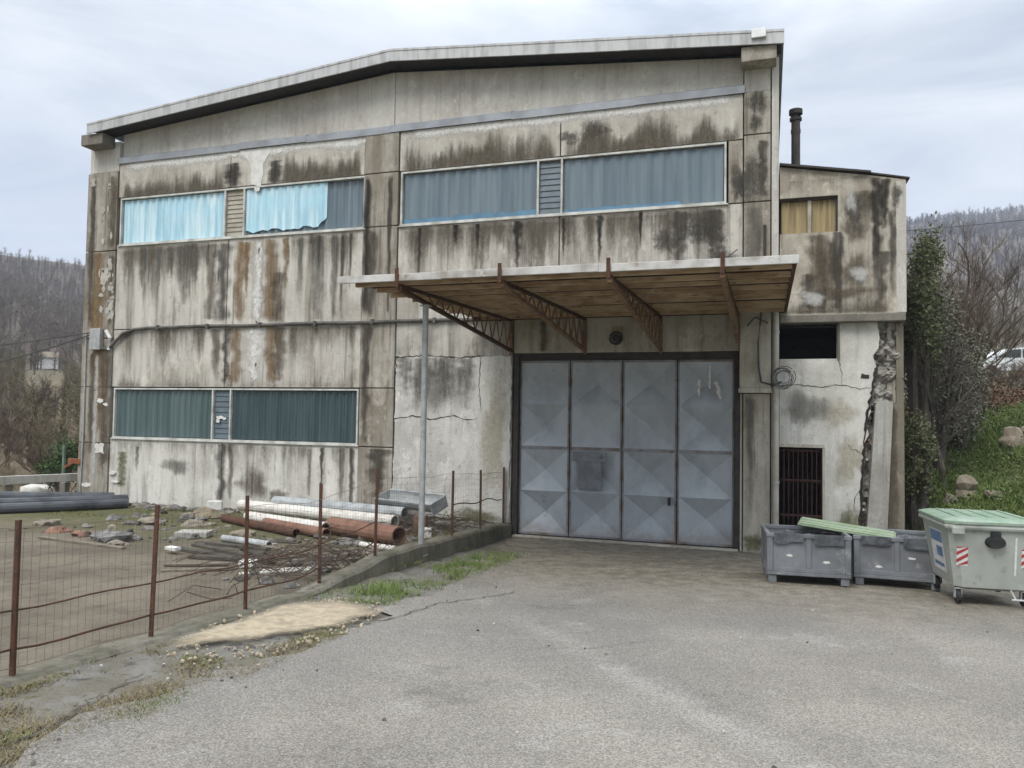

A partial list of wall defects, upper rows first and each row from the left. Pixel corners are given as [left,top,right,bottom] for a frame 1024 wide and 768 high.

damp [406,137,553,170]
damp [562,120,735,155]
damp [748,92,765,129]
peeling [98,259,115,320]
damp [110,163,239,386]
efflorescence [245,242,264,381]
damp [407,209,732,266]
damp [795,178,902,314]
crack [394,355,487,420]
crack [786,358,877,526]
spalling [858,322,904,527]